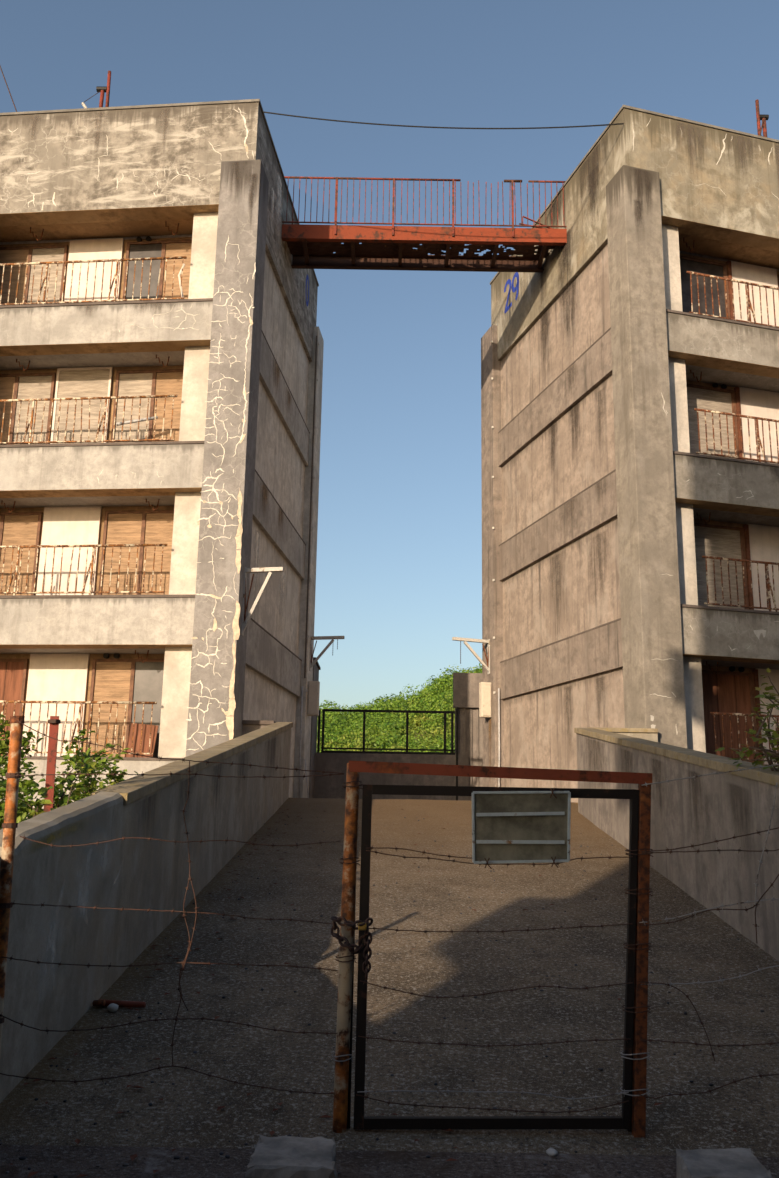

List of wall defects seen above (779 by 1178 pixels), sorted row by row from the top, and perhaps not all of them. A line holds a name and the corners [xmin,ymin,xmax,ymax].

crack [97,107,254,197]
leakage [635,169,650,220]
crack [118,235,256,750]